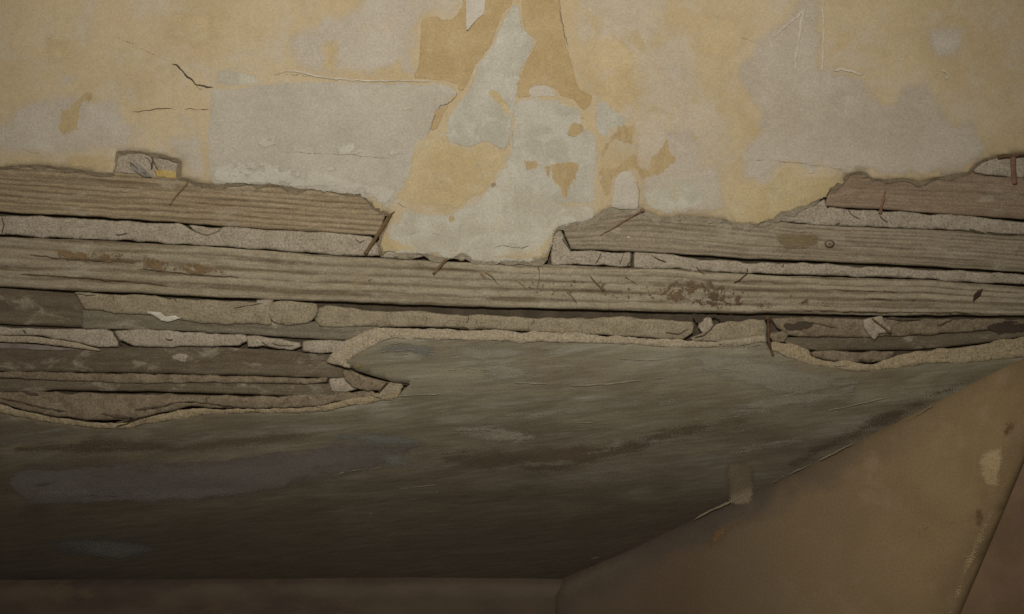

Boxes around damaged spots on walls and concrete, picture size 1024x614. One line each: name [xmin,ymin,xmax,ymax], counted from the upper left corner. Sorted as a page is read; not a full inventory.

crack [118,37,211,112]
peeling [414,0,592,149]
peeling [0,122,1024,266]
rust [595,279,833,309]
flaking render [0,335,100,351]
flaking render [326,327,1024,372]
flaking render [0,391,401,429]